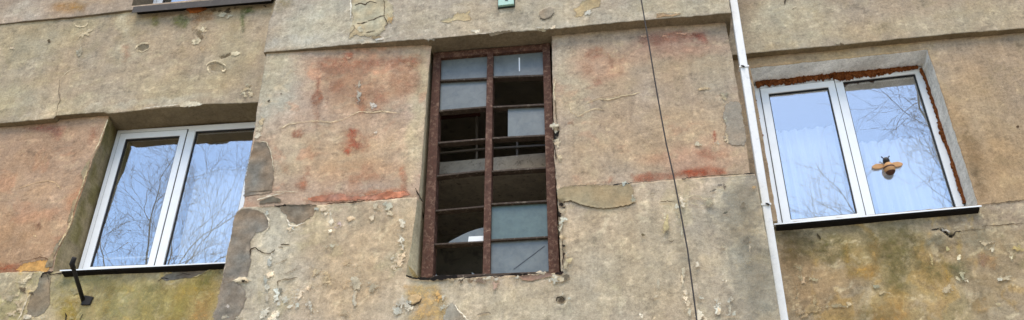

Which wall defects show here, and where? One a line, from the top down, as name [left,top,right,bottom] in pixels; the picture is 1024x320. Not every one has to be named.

flaking render [191,25,241,73]
flaking render [349,0,394,44]
flaking render [250,190,355,249]
flaking render [369,201,406,270]
flaking render [232,256,379,320]
flaking render [393,285,491,320]